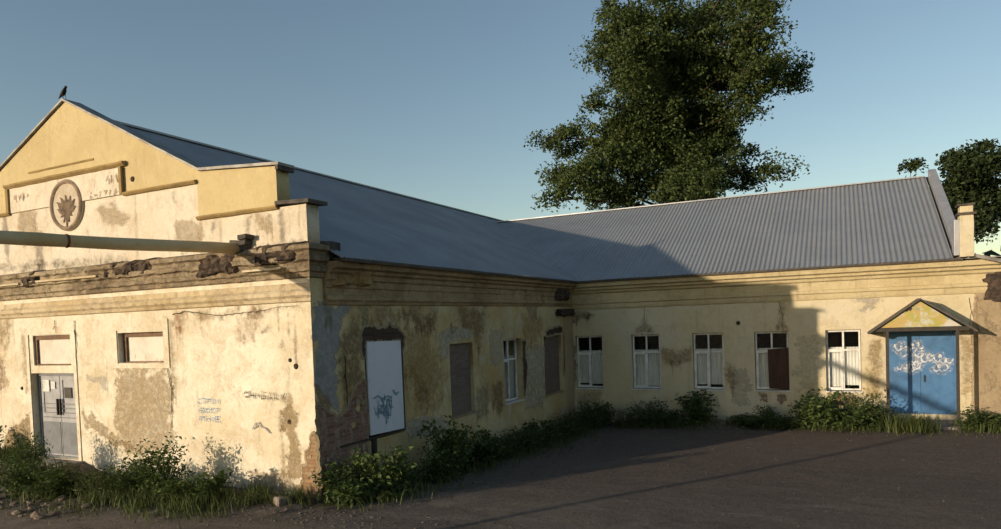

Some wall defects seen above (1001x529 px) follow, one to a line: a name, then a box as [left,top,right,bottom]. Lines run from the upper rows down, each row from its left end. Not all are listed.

spalling [359,321,406,361]
peeling [82,355,175,454]
spalling [251,301,370,501]